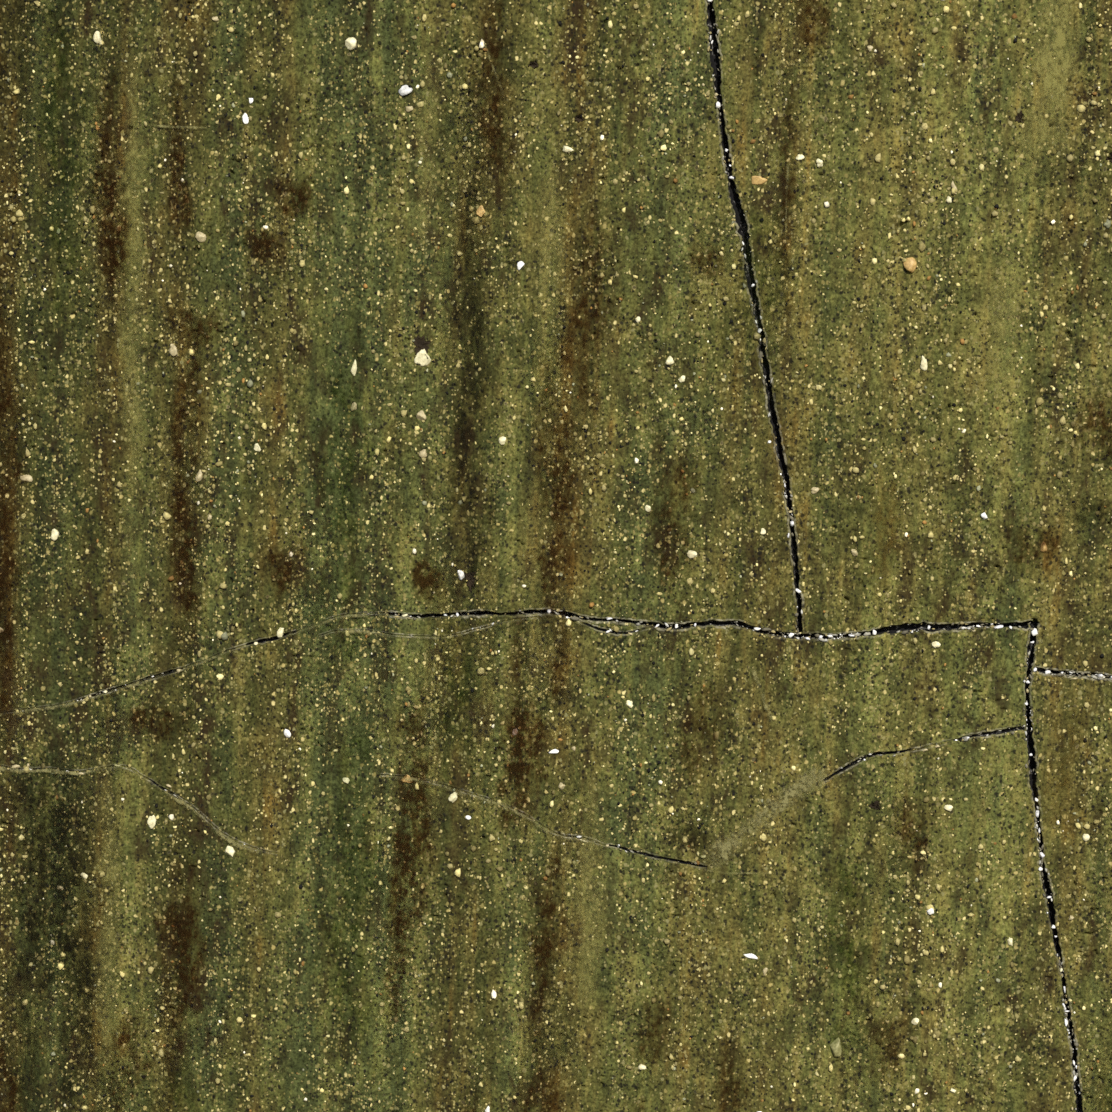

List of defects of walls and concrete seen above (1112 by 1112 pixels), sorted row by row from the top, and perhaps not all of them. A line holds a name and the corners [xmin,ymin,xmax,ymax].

crack [257,0,1112,1112]
crack [0,634,279,712]
crack [0,763,278,855]